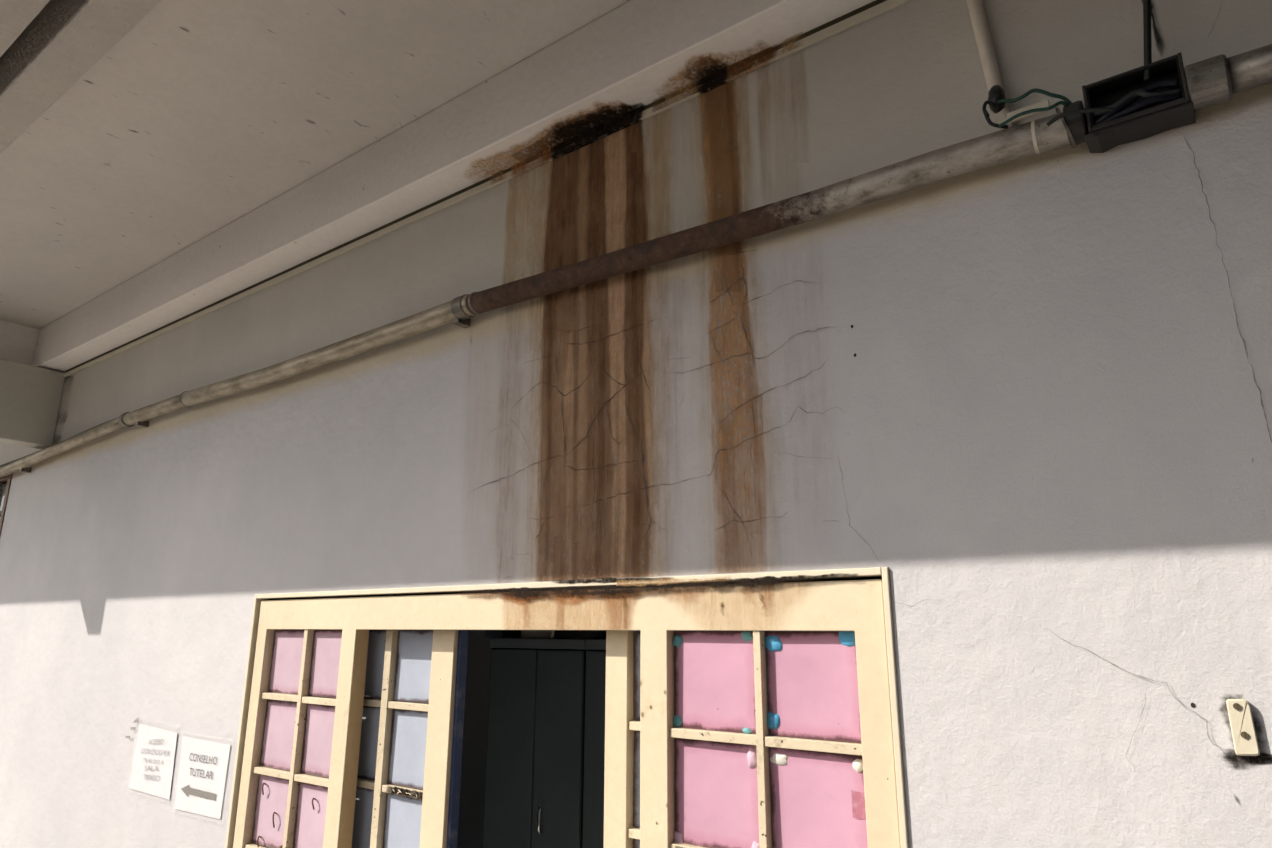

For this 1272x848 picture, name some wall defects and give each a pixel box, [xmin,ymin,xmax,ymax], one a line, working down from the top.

corrosion [483,267,658,629]
corrosion [542,122,650,272]
leakage [472,35,797,181]
crack [489,250,810,556]
corrosion [699,81,739,223]
corrosion [709,241,763,546]
crack [1187,143,1272,441]